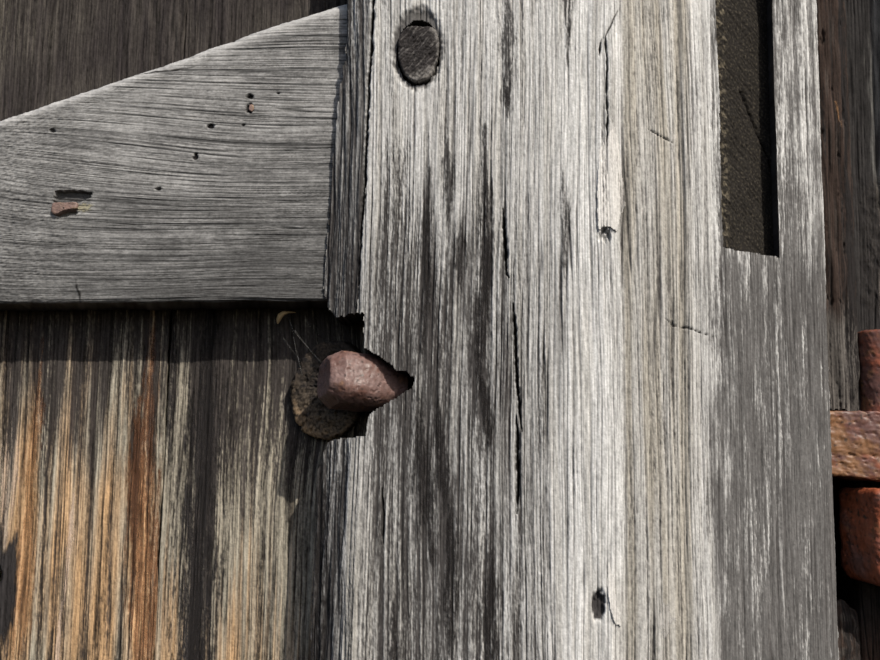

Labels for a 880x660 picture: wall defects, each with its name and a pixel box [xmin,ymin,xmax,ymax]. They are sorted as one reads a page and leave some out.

crack [599,21,613,149]
crack [501,211,509,274]
crack [513,305,522,513]
leakage [0,524,20,643]
leakage [55,493,75,660]